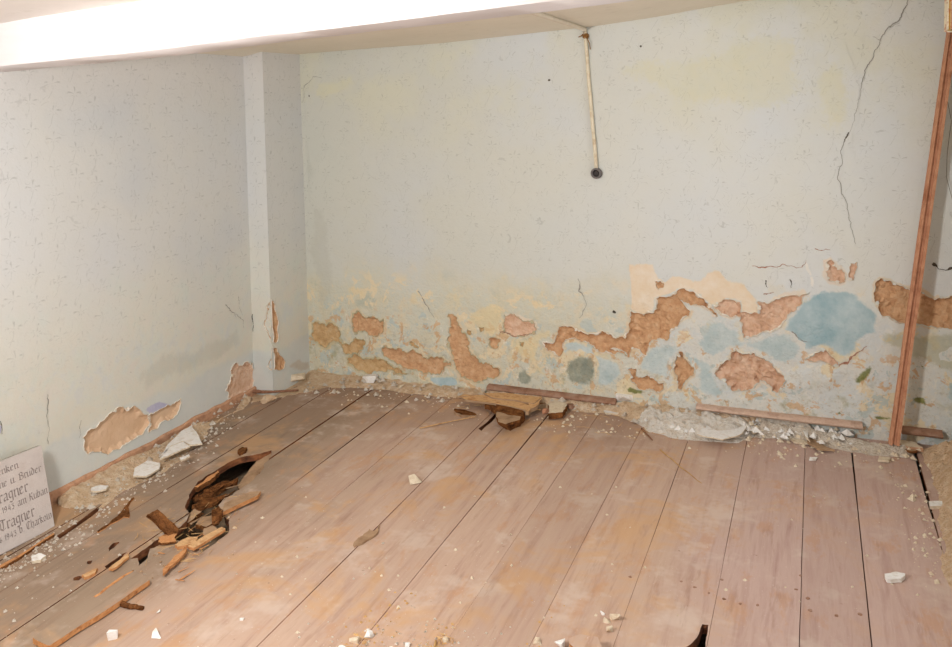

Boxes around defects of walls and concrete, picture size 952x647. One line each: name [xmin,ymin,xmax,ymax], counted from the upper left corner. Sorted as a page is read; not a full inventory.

crack [837,0,908,244]
crack [756,248,828,295]
flaking render [263,299,286,371]
peeling [309,255,952,401]
flaking render [225,361,254,399]
flaking render [82,398,182,455]